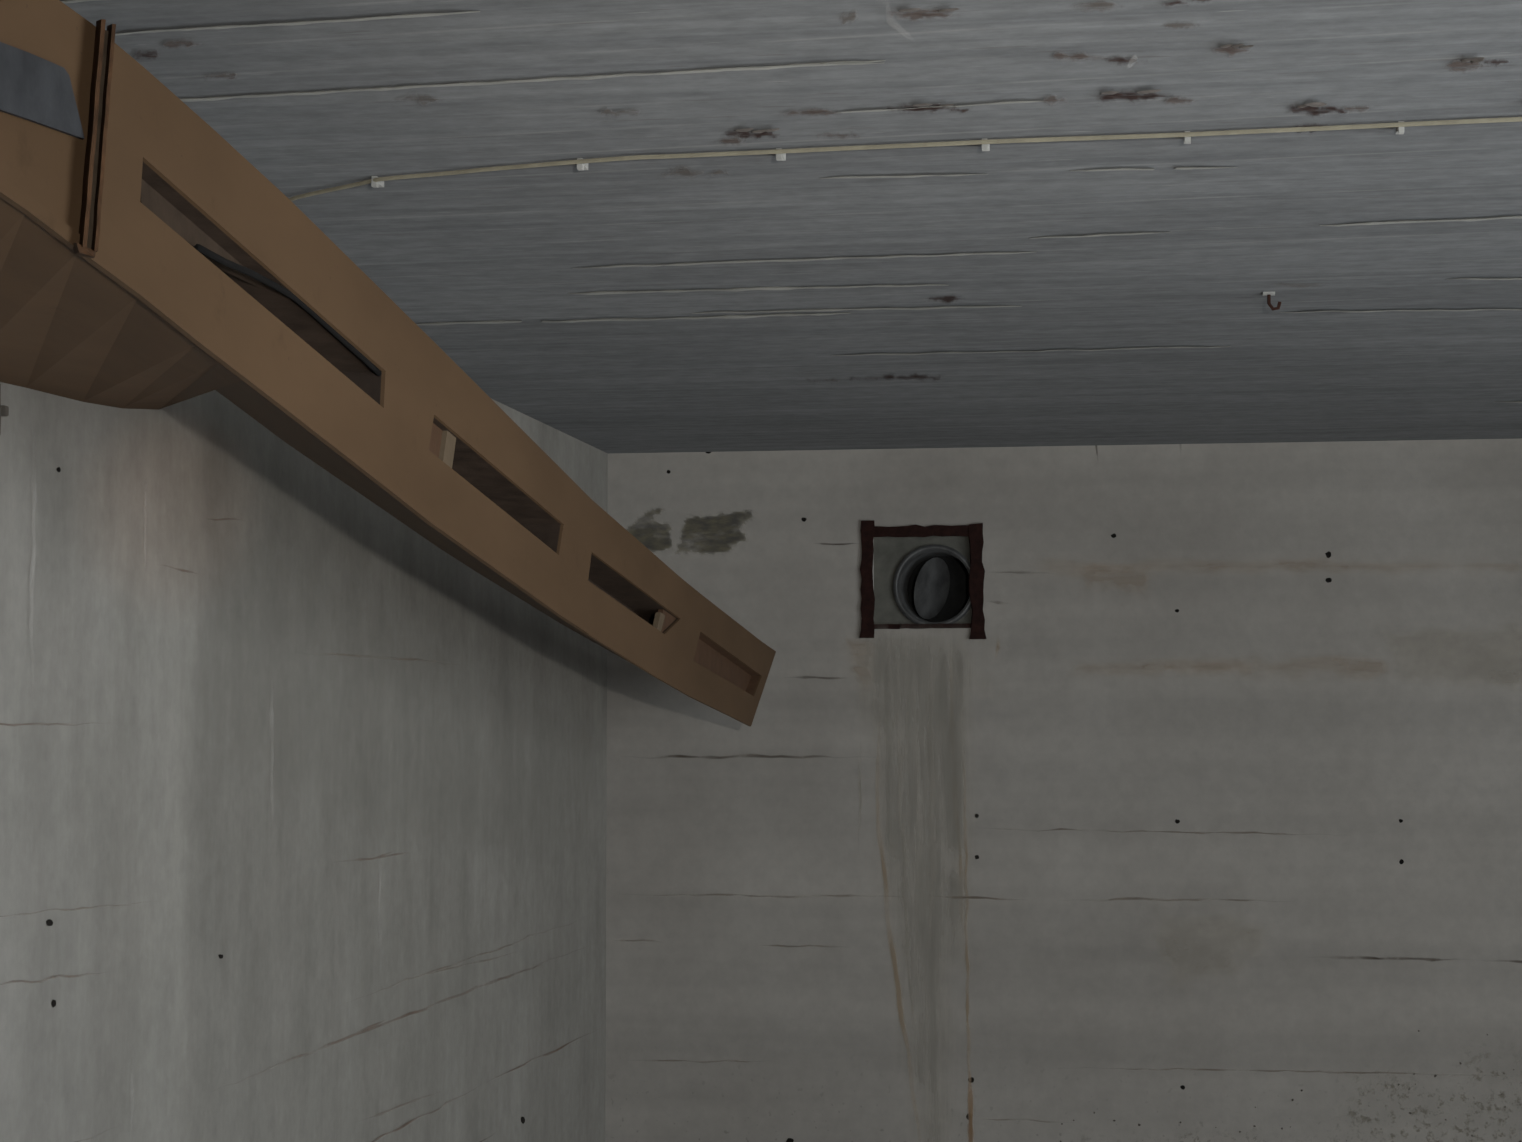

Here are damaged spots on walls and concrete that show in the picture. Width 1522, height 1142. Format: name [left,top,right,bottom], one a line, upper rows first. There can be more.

water stain [875,650,963,1092]